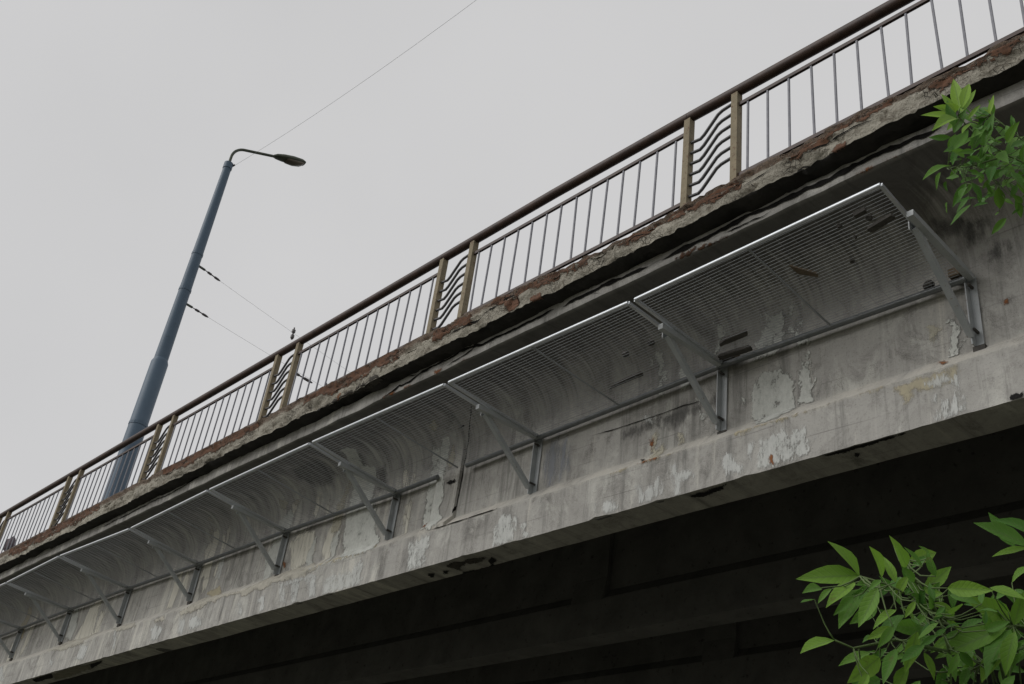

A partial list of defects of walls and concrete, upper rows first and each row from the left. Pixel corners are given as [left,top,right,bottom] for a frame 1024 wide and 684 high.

spalling [322,374,383,408]
peeling [740,302,816,425]
leakage [895,360,966,420]